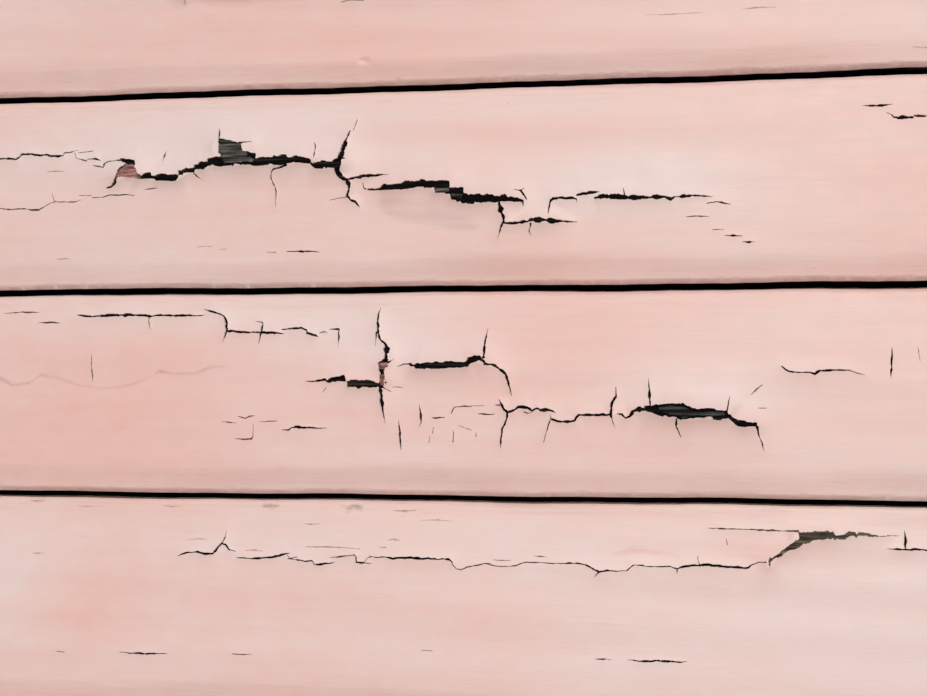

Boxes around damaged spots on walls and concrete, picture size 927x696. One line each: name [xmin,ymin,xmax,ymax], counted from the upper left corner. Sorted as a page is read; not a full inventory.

peeling [106,158,142,189]
crack [0,119,755,243]
crack [5,309,340,345]
crack [305,308,766,450]
crack [781,365,865,375]
crack [887,347,895,375]
crack [221,415,322,440]
crack [178,530,767,577]
crack [887,530,927,551]